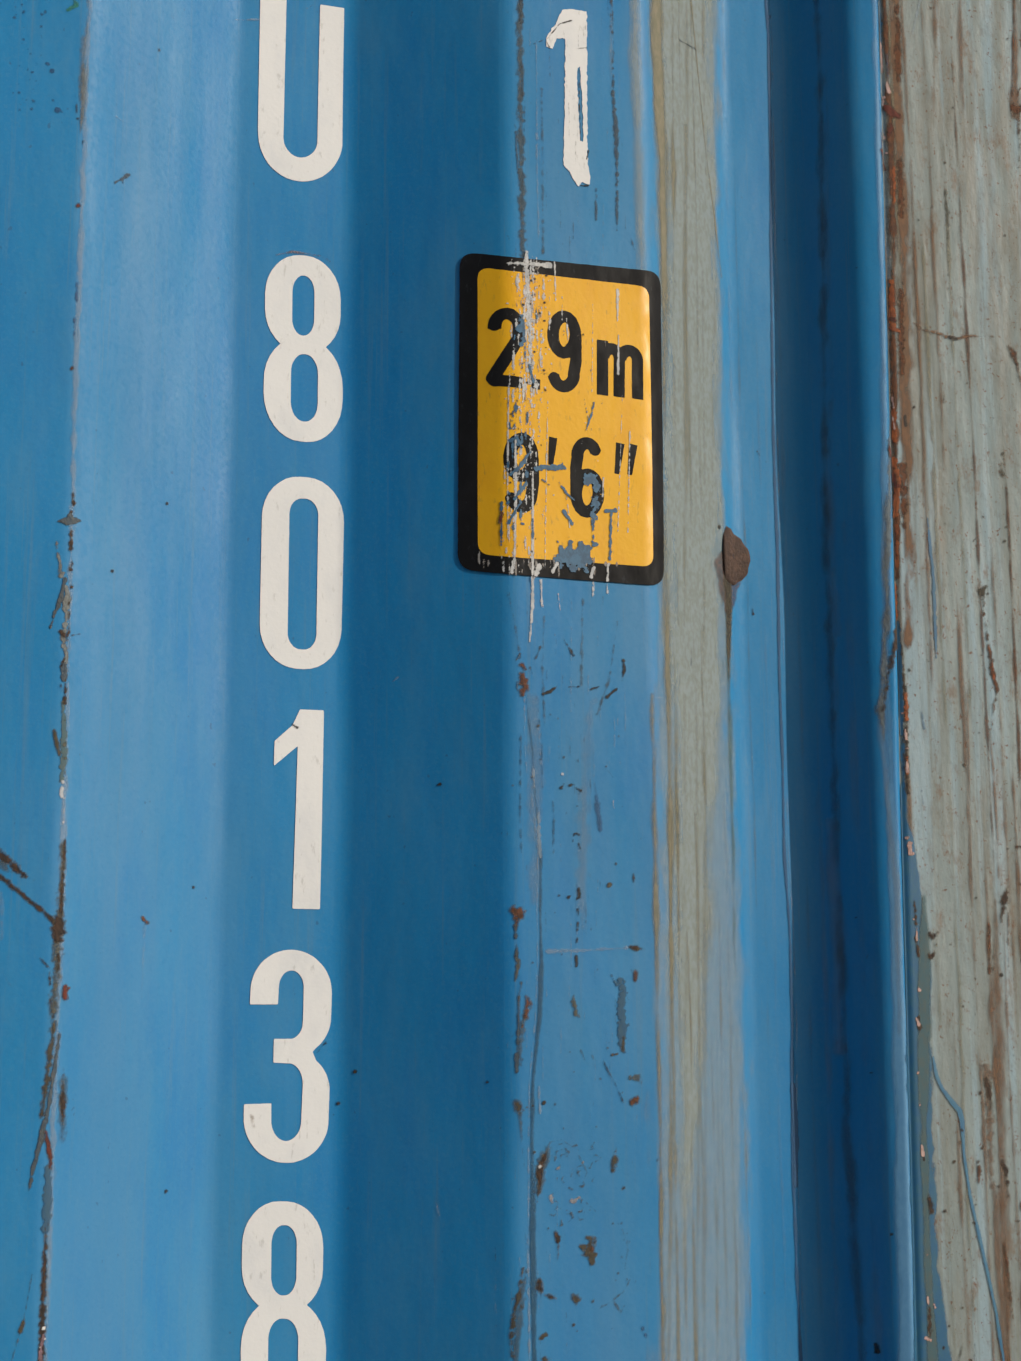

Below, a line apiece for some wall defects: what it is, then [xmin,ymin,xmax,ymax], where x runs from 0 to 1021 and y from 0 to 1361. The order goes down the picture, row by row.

rust [1007,0,1021,134]
peeling [478,251,631,584]
rust [878,0,966,856]
rust [979,578,1007,831]
rust [1013,623,1021,802]
rust [0,840,70,1032]
rust [510,906,532,1073]
rust [38,1223,48,1361]
rust [509,1267,555,1356]
rust [536,1153,547,1195]
rust [579,1236,598,1265]
rust [975,846,1021,1361]